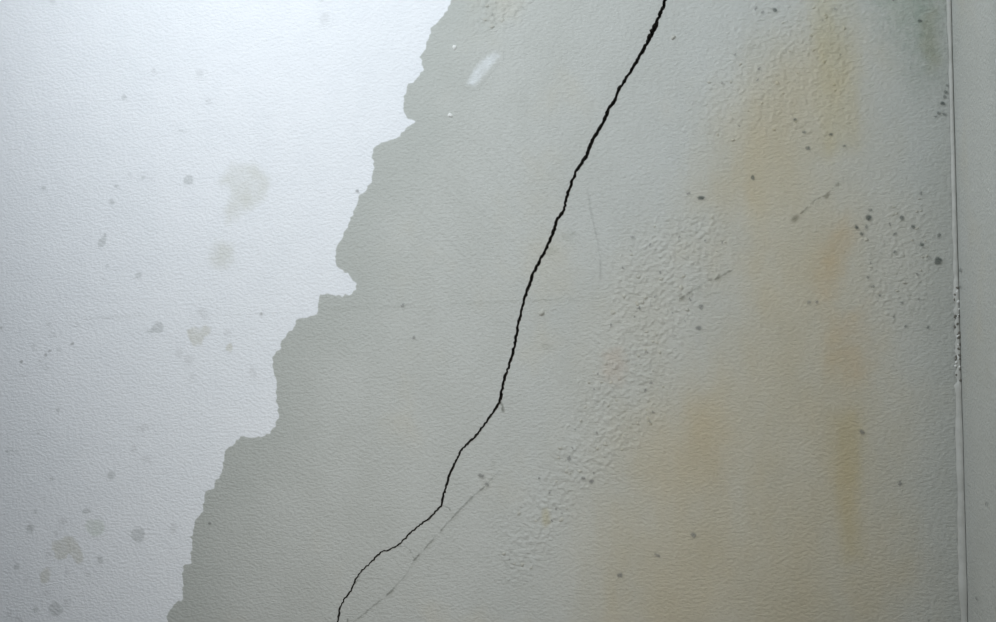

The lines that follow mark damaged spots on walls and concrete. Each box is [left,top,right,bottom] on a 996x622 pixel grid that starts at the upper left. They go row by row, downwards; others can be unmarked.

crack [337,0,667,622]
water stain [165,0,961,622]
flaking render [953,287,962,381]
water stain [951,0,996,622]